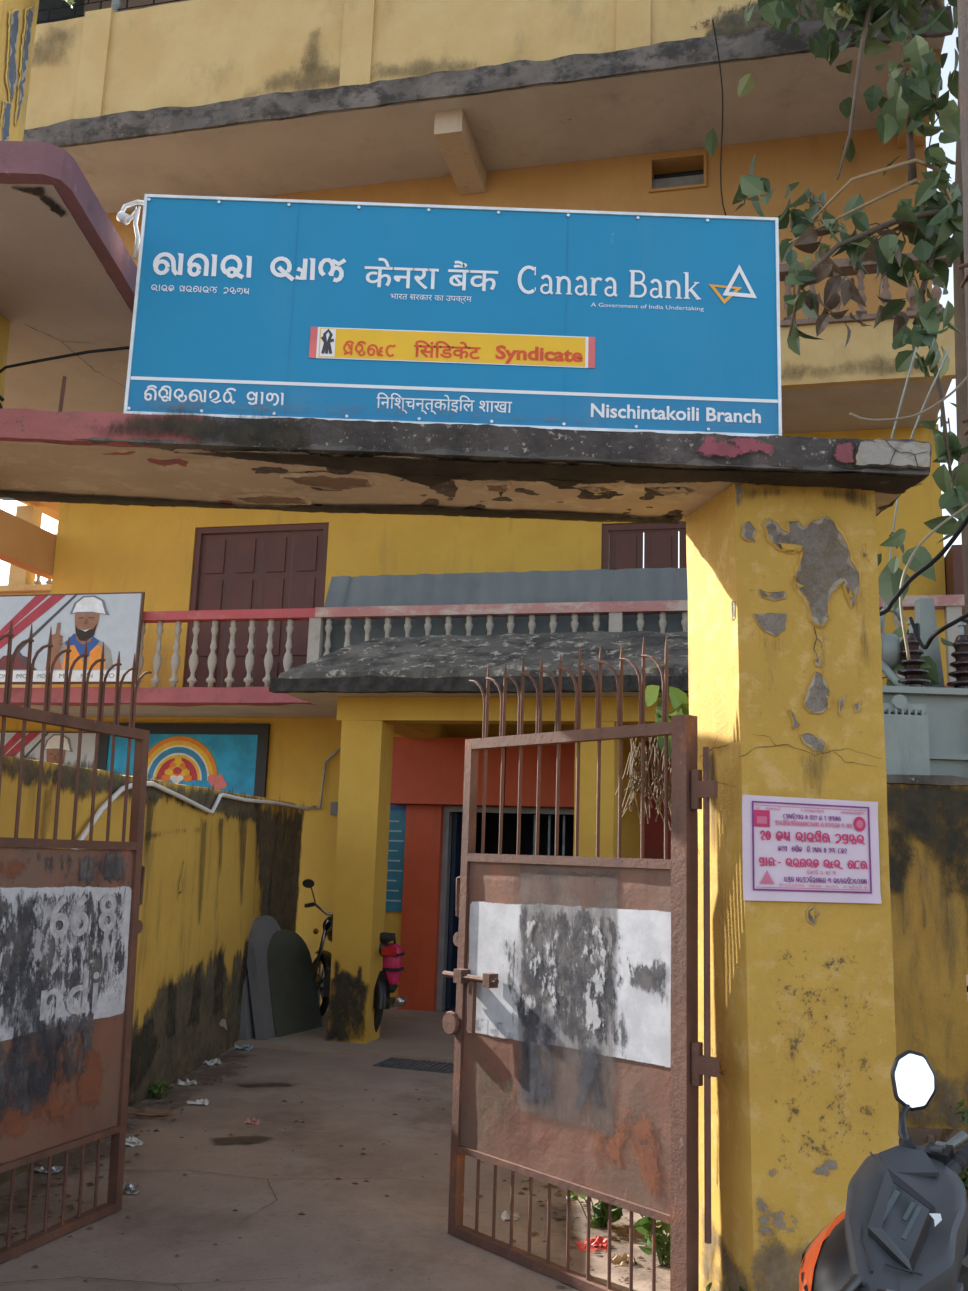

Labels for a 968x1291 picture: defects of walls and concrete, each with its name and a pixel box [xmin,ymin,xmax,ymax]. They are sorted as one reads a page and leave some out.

damp [268,43,340,88]
damp [109,409,310,452]
spalling [853,438,932,470]
spalling [573,483,616,493]
spalling [644,482,700,496]
peeling [741,513,862,637]
peeling [789,656,861,752]
crack [702,728,882,787]
damp [887,784,968,911]
damp [128,941,291,1109]
damp [327,962,368,1042]
peeling [757,1198,798,1237]